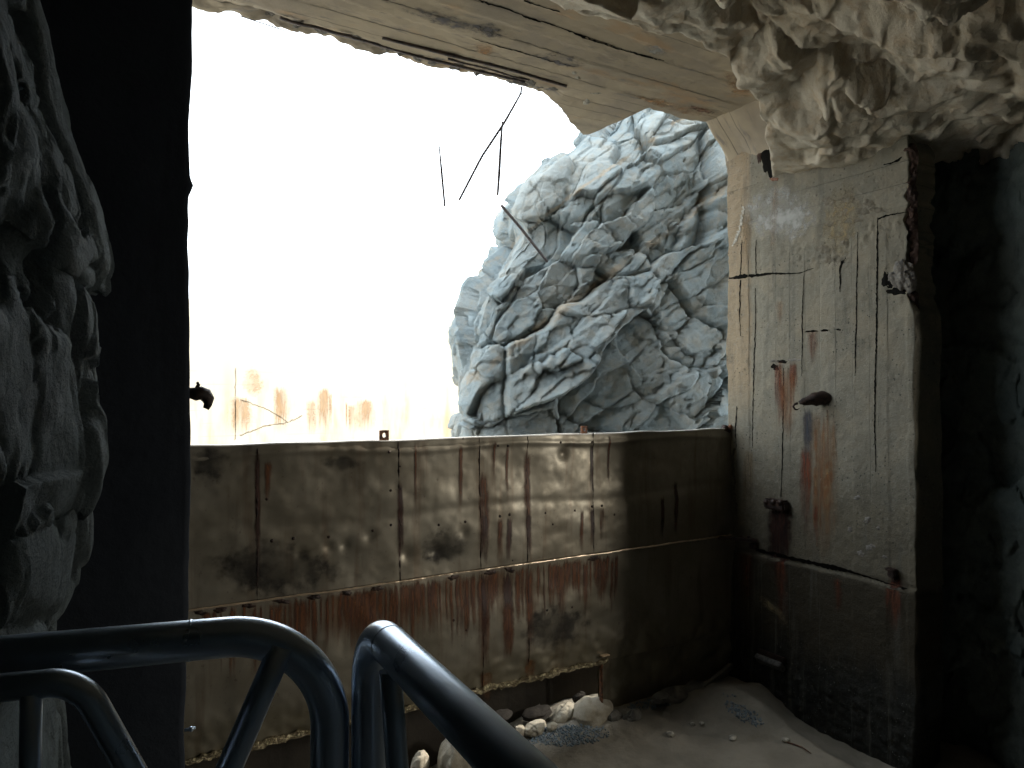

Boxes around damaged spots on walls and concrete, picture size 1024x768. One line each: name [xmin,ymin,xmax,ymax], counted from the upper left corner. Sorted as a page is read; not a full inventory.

crack [475,39,575,67]
spalling [881,143,920,311]
crack [729,240,814,497]
crack [839,212,907,472]
corrosion [194,555,618,650]
corrosion [398,446,417,555]
corrosion [479,476,512,555]
corrosion [493,443,509,488]
corrosion [580,509,604,541]
corrosion [800,412,832,526]
crack [756,549,907,593]